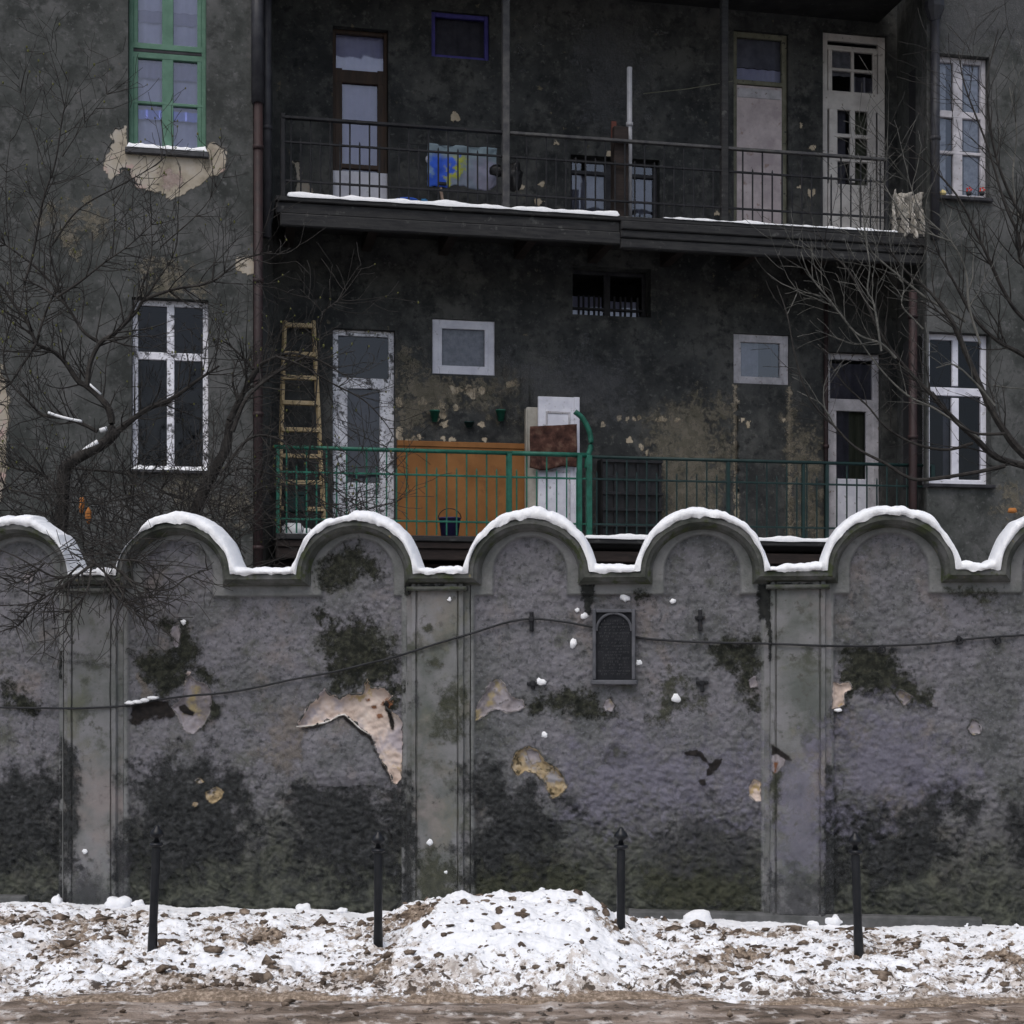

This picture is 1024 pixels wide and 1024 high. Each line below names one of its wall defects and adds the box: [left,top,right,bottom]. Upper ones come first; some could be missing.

peeling [103,126,227,200]
spalling [124,671,220,734]
spalling [296,680,403,786]
spalling [475,679,526,721]
spalling [832,681,853,712]
spalling [192,778,225,807]
leakage [0,737,420,906]
leakage [444,753,589,890]
spalling [510,746,568,798]
spalling [748,745,792,822]
leakage [647,762,984,917]
leakage [999,789,1024,868]